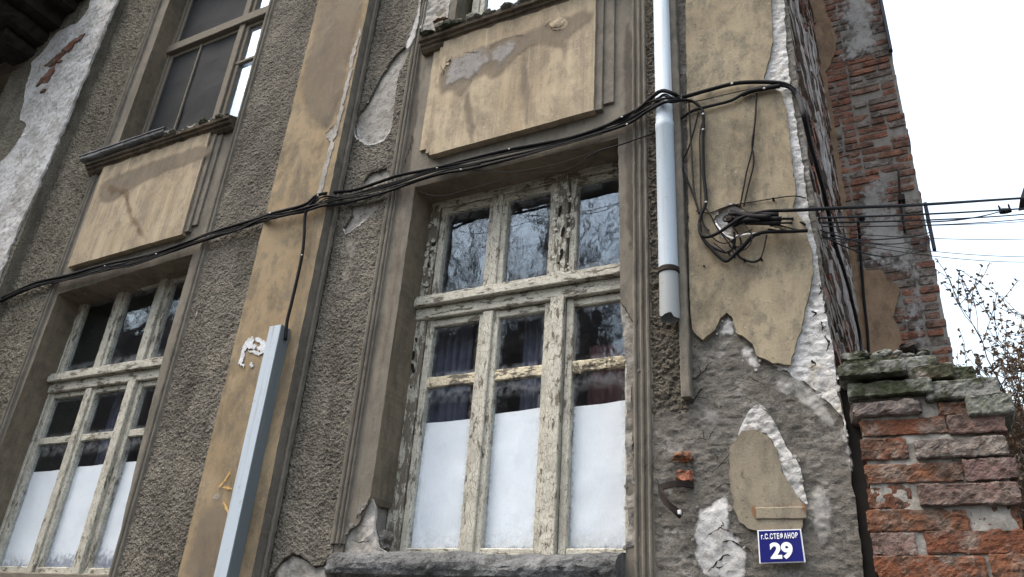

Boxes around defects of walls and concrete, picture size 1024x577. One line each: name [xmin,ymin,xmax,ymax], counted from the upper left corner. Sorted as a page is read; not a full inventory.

spalling [0,0,119,277]
spalling [317,29,361,193]
spalling [354,0,451,146]
peeling [446,33,528,84]
peeling [423,219,438,293]
spalling [742,0,851,466]
spalling [716,318,736,335]
spalling [669,448,696,481]
spalling [738,404,830,541]
spalling [274,557,328,577]
spalling [337,499,394,554]
spalling [691,498,746,577]